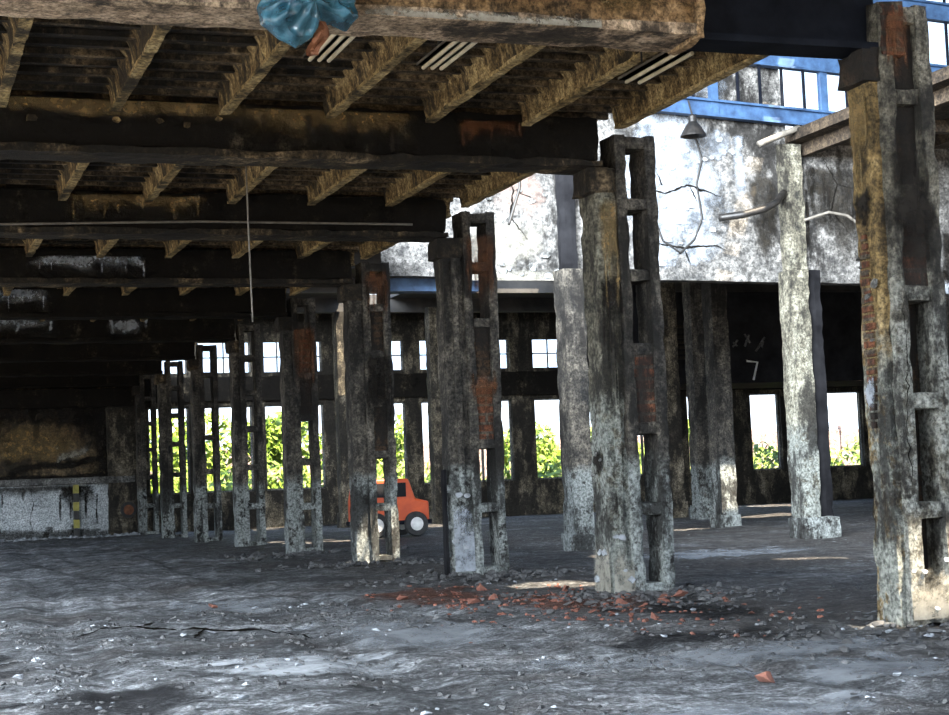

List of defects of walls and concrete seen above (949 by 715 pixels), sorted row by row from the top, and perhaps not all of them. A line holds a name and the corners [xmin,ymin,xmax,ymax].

crack [656,171,721,203]
water stain [39,256,145,271]
corrosion [467,237,493,293]
crack [660,243,725,265]
water stain [0,289,44,308]
water stain [109,320,148,333]
water stain [0,412,89,478]